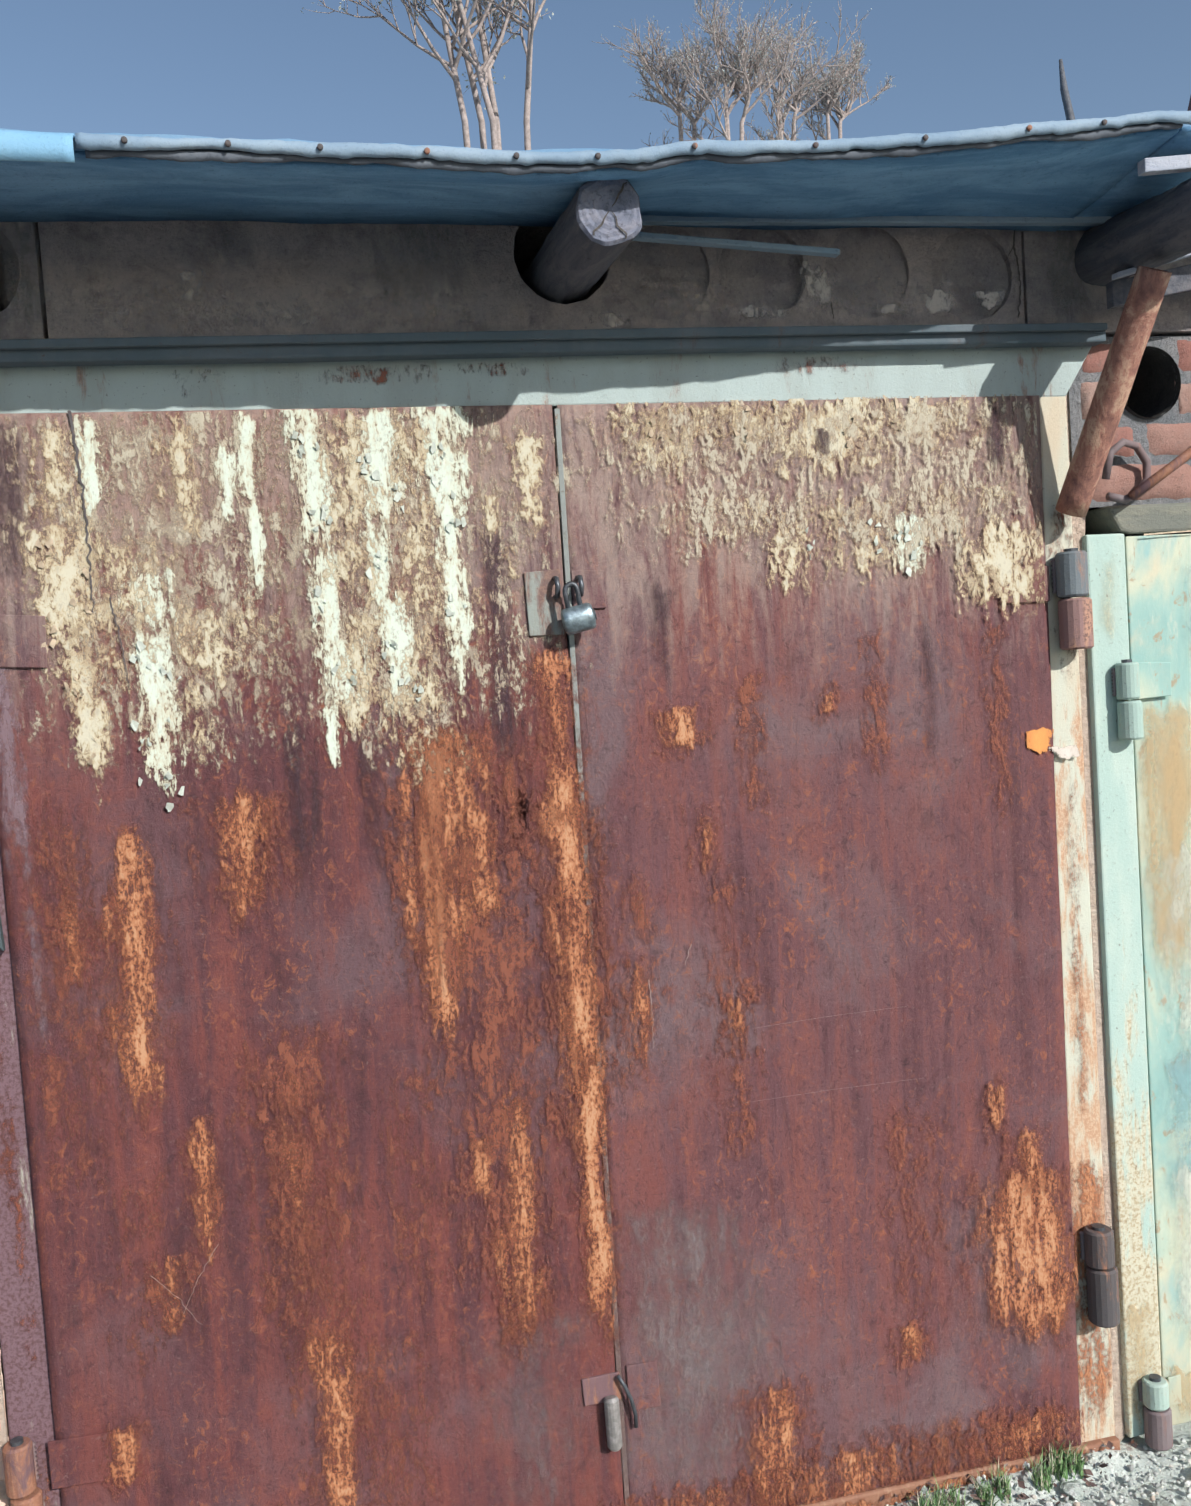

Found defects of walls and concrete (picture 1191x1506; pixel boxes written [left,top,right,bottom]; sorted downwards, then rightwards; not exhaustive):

peeling [1,394,1046,812]
rust [1049,512,1072,557]
rust [650,695,713,760]
rust [812,680,841,723]
rust [184,786,295,933]
rust [0,805,227,1376]
rust [348,645,666,1363]
rust [1072,906,1086,1101]
rust [254,1066,385,1506]
rust [598,1073,1112,1506]
peeling [1177,1167,1191,1216]
rust [100,1417,153,1500]